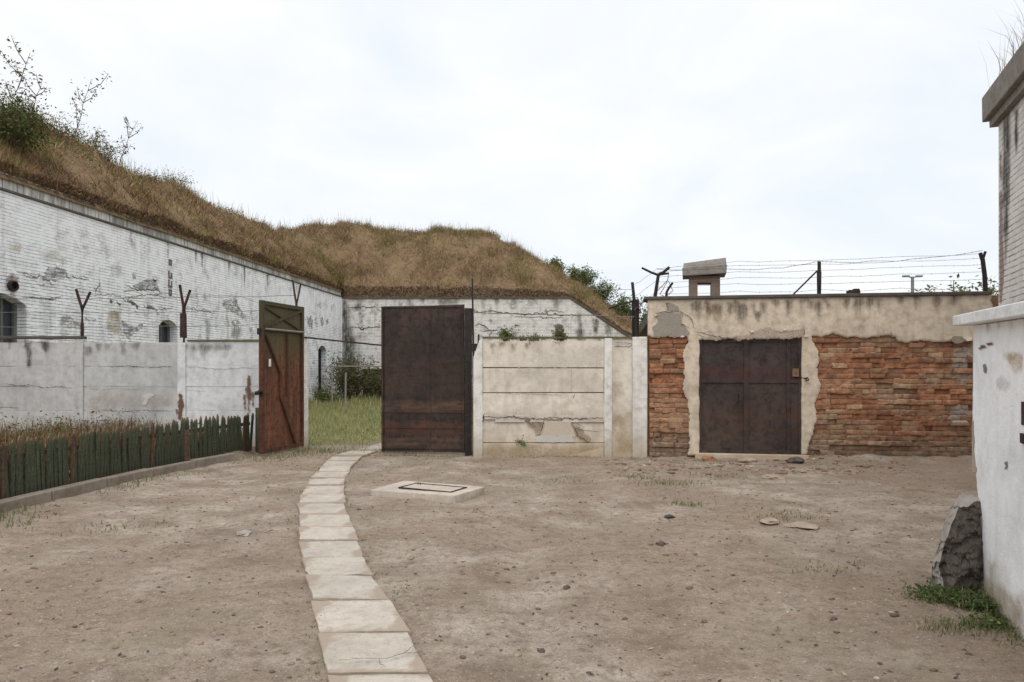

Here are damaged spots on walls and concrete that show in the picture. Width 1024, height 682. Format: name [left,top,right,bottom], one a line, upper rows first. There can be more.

water stain [1003,112,1017,235]
peeling [38,265,72,286]
peeling [110,273,163,312]
crack [475,310,582,332]
corrosion [176,394,184,420]
corrosion [243,376,254,413]
peeling [649,302,694,457]
peeling [737,327,986,472]
spalling [526,420,591,443]